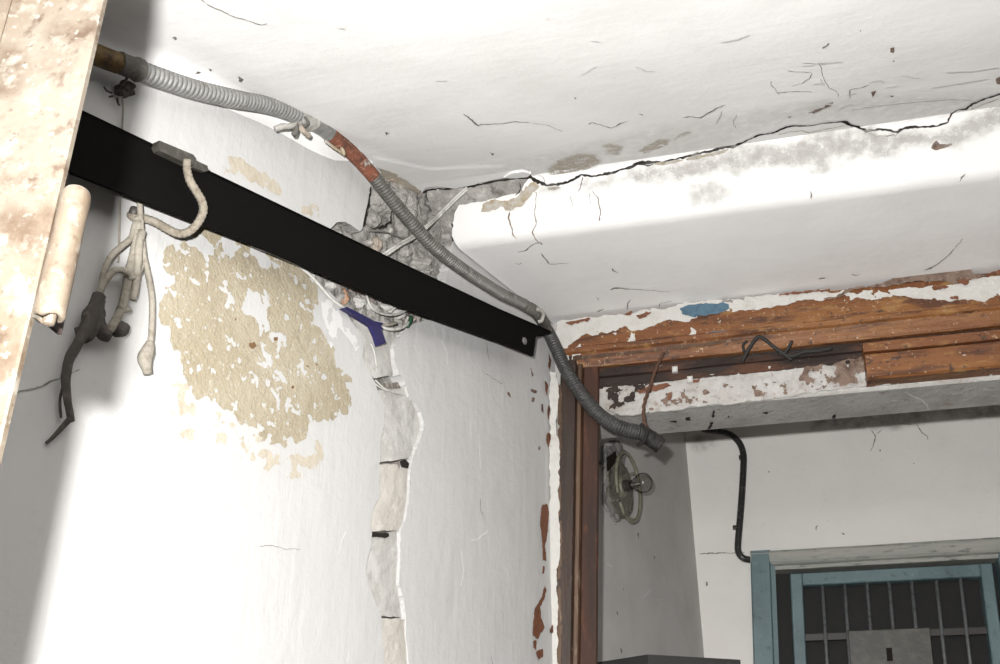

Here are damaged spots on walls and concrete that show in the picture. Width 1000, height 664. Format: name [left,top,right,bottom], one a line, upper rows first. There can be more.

crack [423,43,1000,264]
flaking render [331,186,442,279]
flaking render [374,159,560,247]
peeling [556,269,1000,360]
flaking render [599,357,898,423]
peeling [158,226,430,664]
peeling [531,355,562,664]